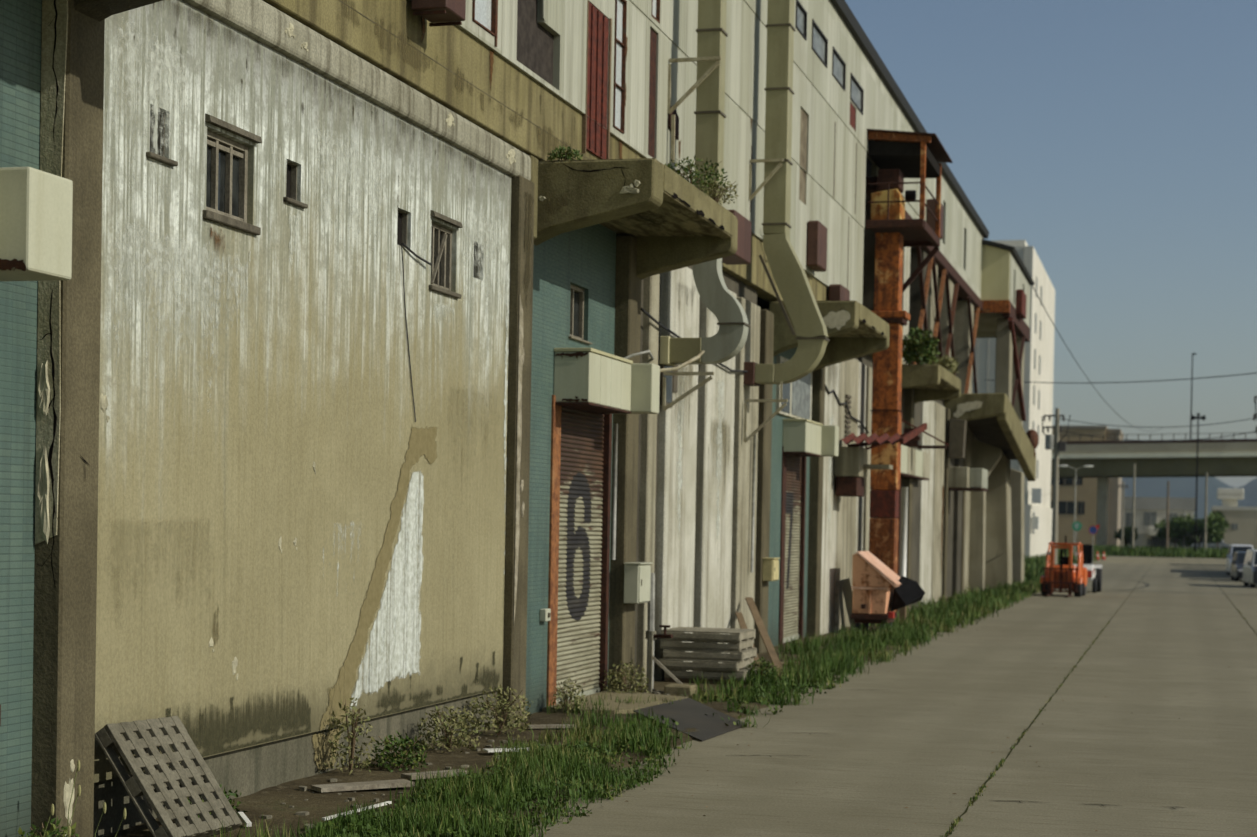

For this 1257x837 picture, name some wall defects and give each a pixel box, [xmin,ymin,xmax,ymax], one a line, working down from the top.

crack [44,0,59,138]
water stain [117,24,186,170]
corrosion [0,258,26,271]
water stain [118,227,245,328]
peeling [823,310,884,335]
peeling [953,401,983,418]
peeling [320,427,437,731]
water stain [359,651,499,721]
water stain [166,694,341,771]